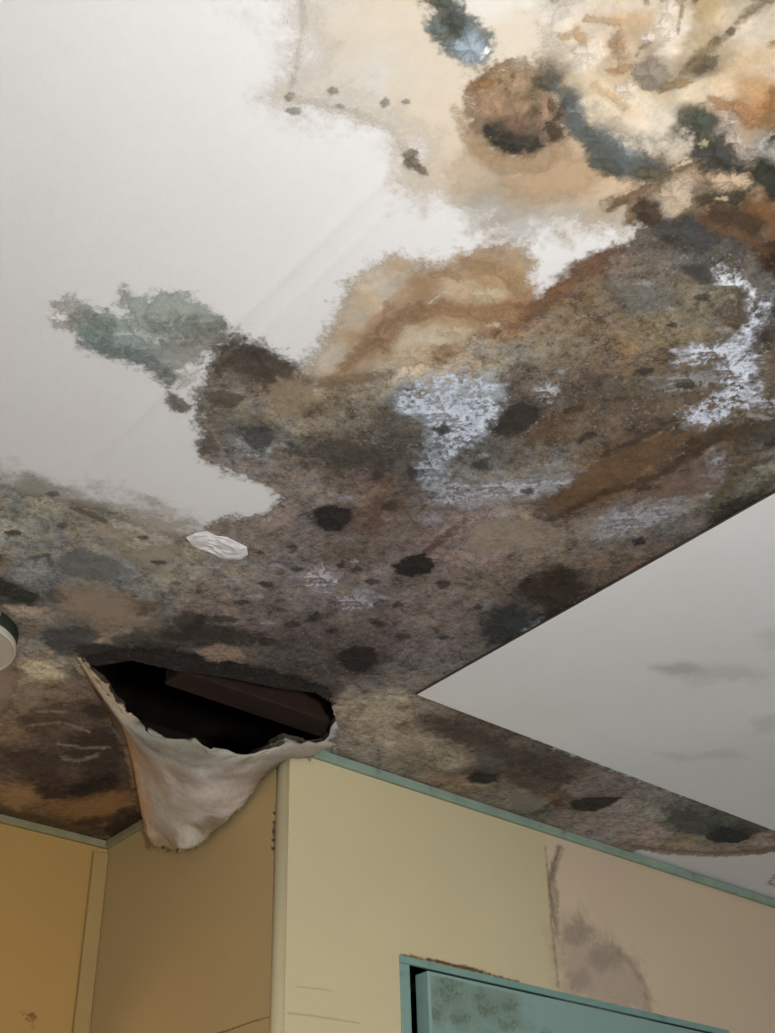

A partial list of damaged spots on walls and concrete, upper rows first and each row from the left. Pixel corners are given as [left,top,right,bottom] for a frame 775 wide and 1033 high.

leakage [0,103,775,857]
leakage [273,0,775,235]